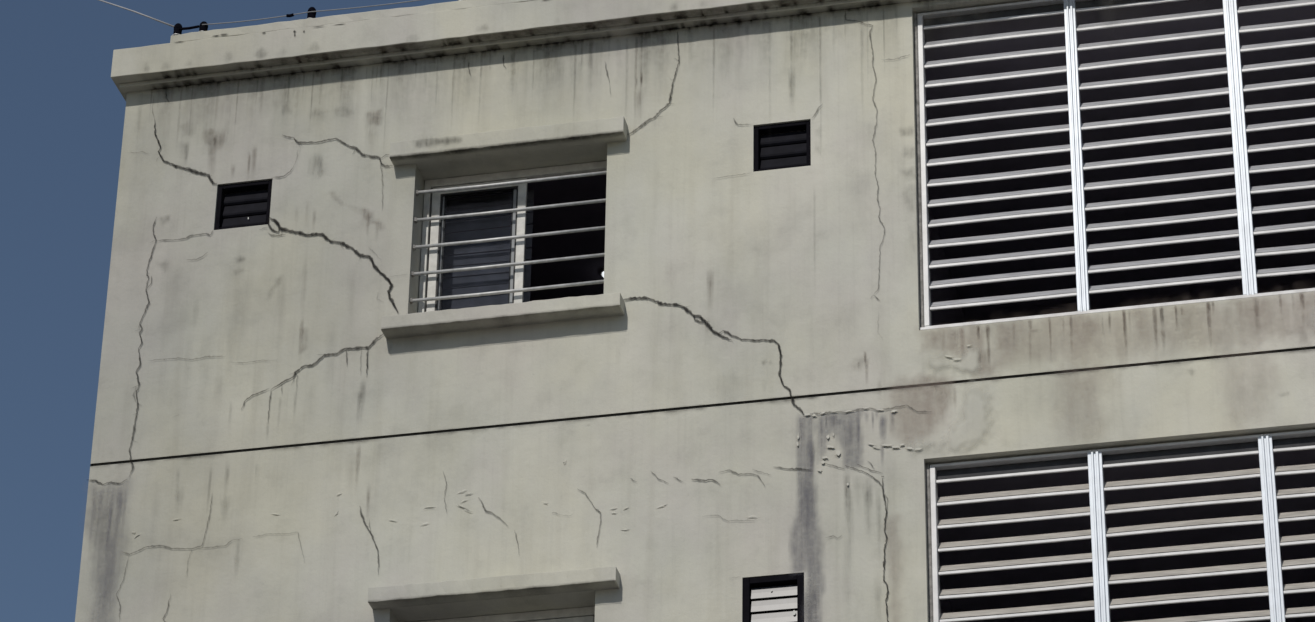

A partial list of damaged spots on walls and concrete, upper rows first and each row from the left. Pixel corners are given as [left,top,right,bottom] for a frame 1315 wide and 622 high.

crack [630,40,680,134]
crack [154,125,216,184]
crack [277,135,389,178]
crack [243,217,398,418]
crack [623,296,923,414]
crack [360,511,379,562]
crack [632,463,889,622]